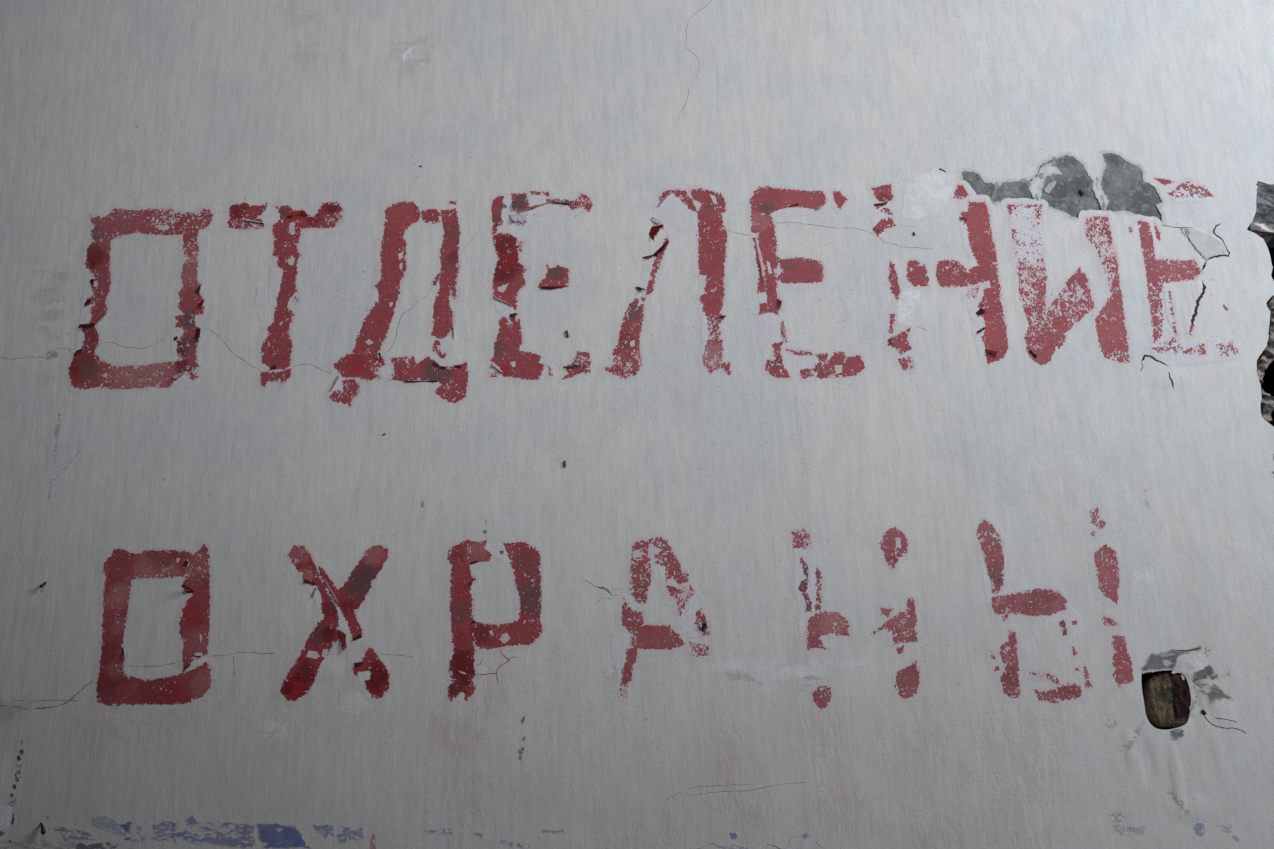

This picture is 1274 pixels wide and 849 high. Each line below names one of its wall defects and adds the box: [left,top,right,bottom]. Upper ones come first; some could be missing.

flaking render [939,149,1213,266]
flaking render [1248,182,1274,247]
flaking render [1139,643,1236,711]
flaking render [1169,727,1186,743]